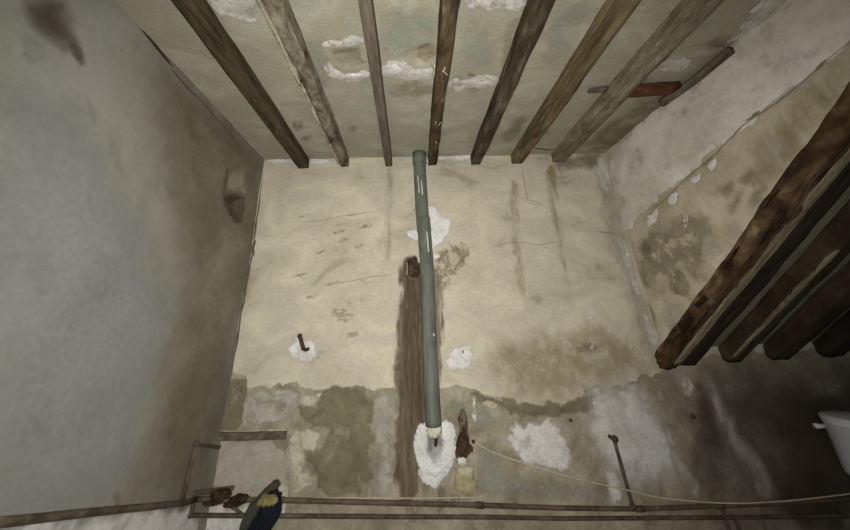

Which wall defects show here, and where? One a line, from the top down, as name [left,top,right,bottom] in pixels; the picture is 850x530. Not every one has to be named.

water stain [33,4,83,61]
peeling [322,35,370,82]
peeling [382,44,436,97]
peeling [448,74,499,93]
peeling [691,158,717,183]
water stain [435,247,468,286]
corrosion [394,257,425,508]
water stain [472,393,595,416]
water stain [298,386,373,496]
water stain [694,375,850,528]
water stain [606,470,621,503]